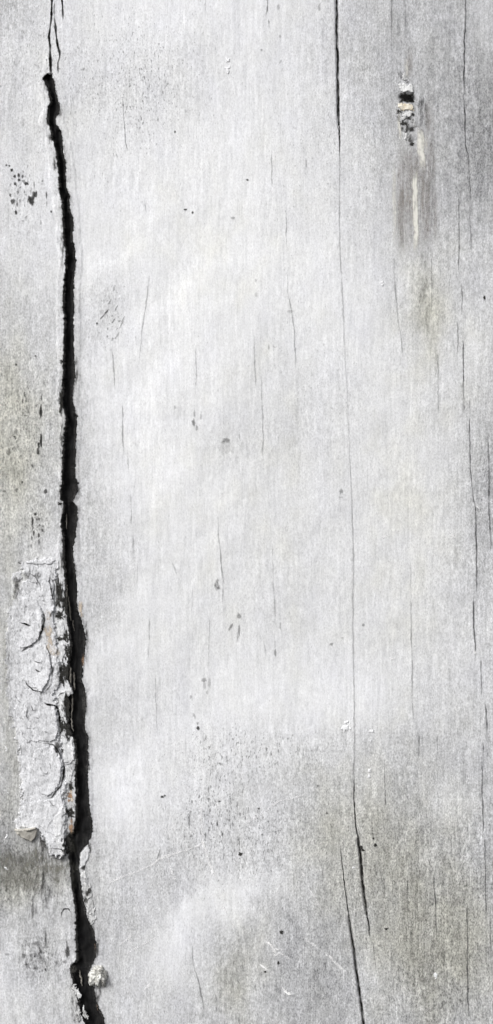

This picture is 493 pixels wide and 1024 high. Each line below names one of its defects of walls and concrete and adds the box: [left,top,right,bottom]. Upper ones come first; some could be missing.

crack [333,0,341,153]
crack [42,0,105,1024]
peeling [4,558,75,860]
crack [341,784,374,1024]